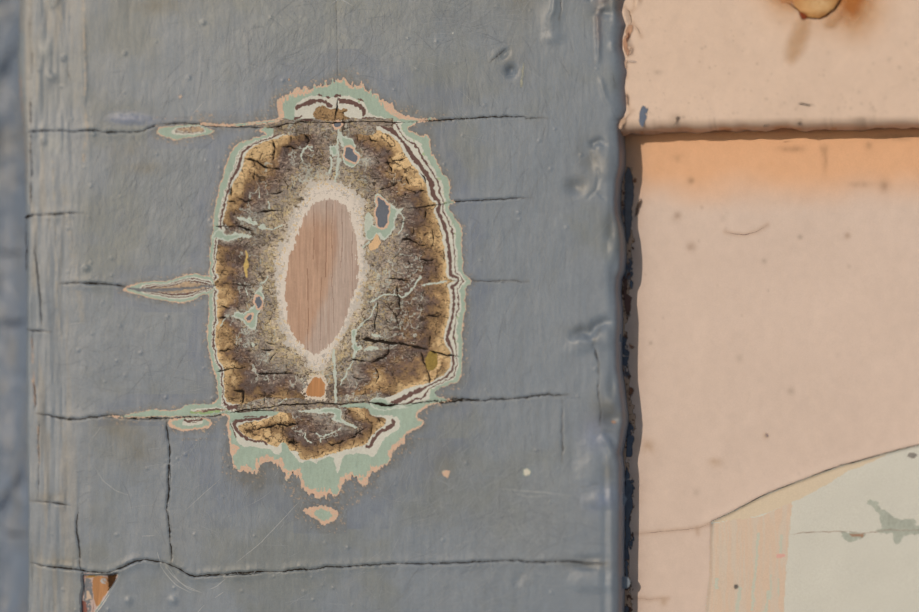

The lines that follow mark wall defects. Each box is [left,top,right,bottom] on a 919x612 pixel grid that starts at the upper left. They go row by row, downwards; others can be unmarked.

rust [837,0,867,20]
crack [3,50,606,577]
peeling [79,572,118,612]
peeling [706,444,919,612]